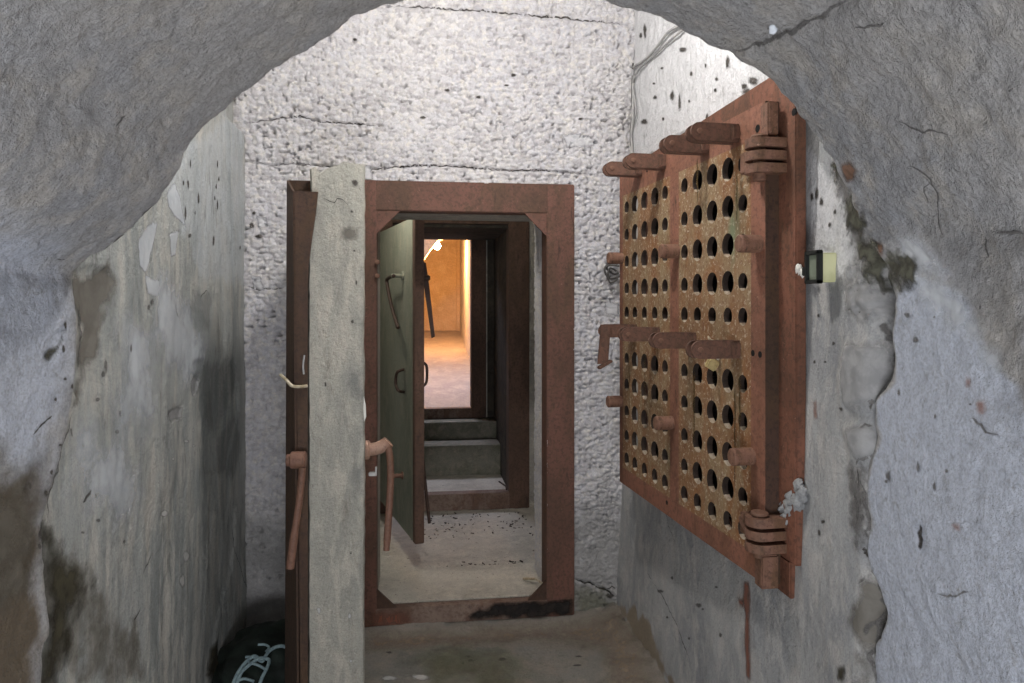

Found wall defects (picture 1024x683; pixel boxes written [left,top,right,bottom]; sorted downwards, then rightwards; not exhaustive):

crack [740,3,840,52]
crack [256,115,374,126]
peeling [168,180,200,255]
spalling [828,163,883,254]
water stain [846,195,917,292]
water stain [72,264,116,366]
peeling [139,223,204,395]
spalling [844,265,909,342]
spalling [848,469,871,557]
water stain [0,479,85,683]
corrosion [739,583,750,679]
spalling [864,585,888,676]